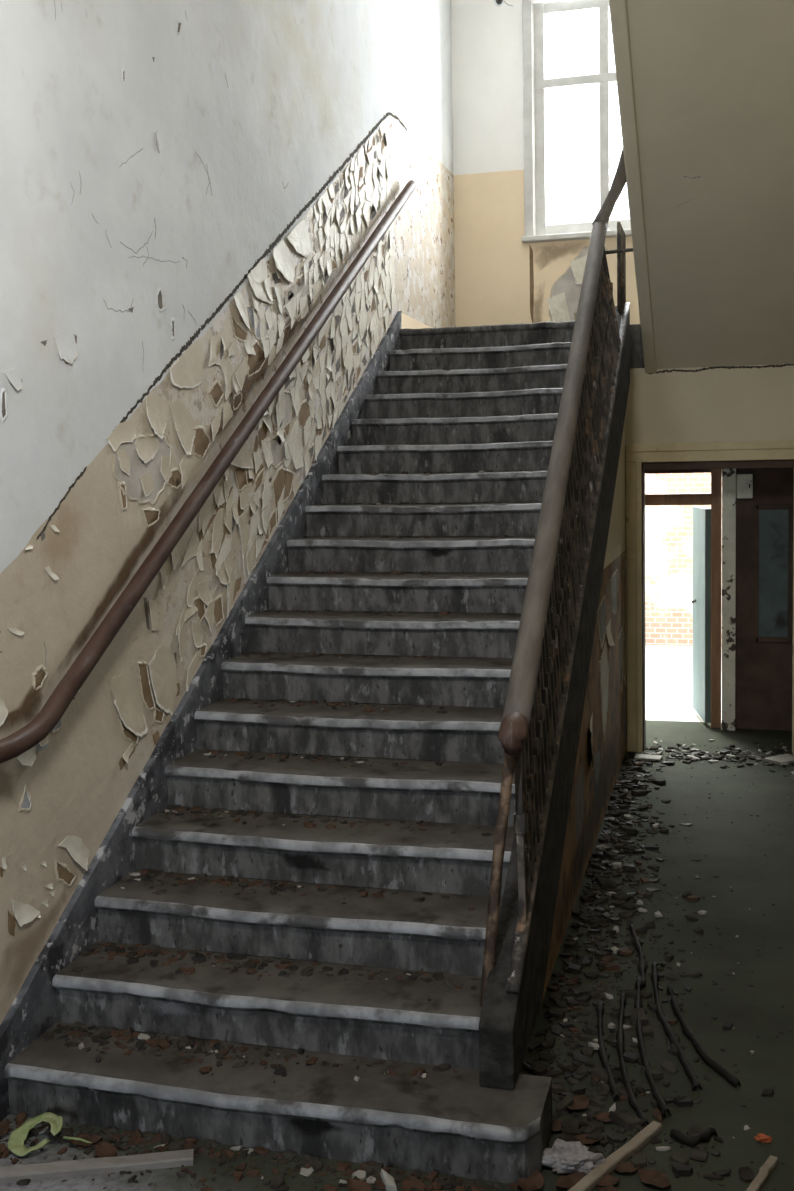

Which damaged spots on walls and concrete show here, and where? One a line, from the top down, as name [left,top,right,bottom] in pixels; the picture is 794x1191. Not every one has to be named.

peeling [107,112,407,529]
peeling [25,466,87,550]
peeling [110,214,402,770]
peeling [32,642,48,690]
peeling [17,716,63,767]
peeling [8,835,90,936]
spalling [284,855,325,869]